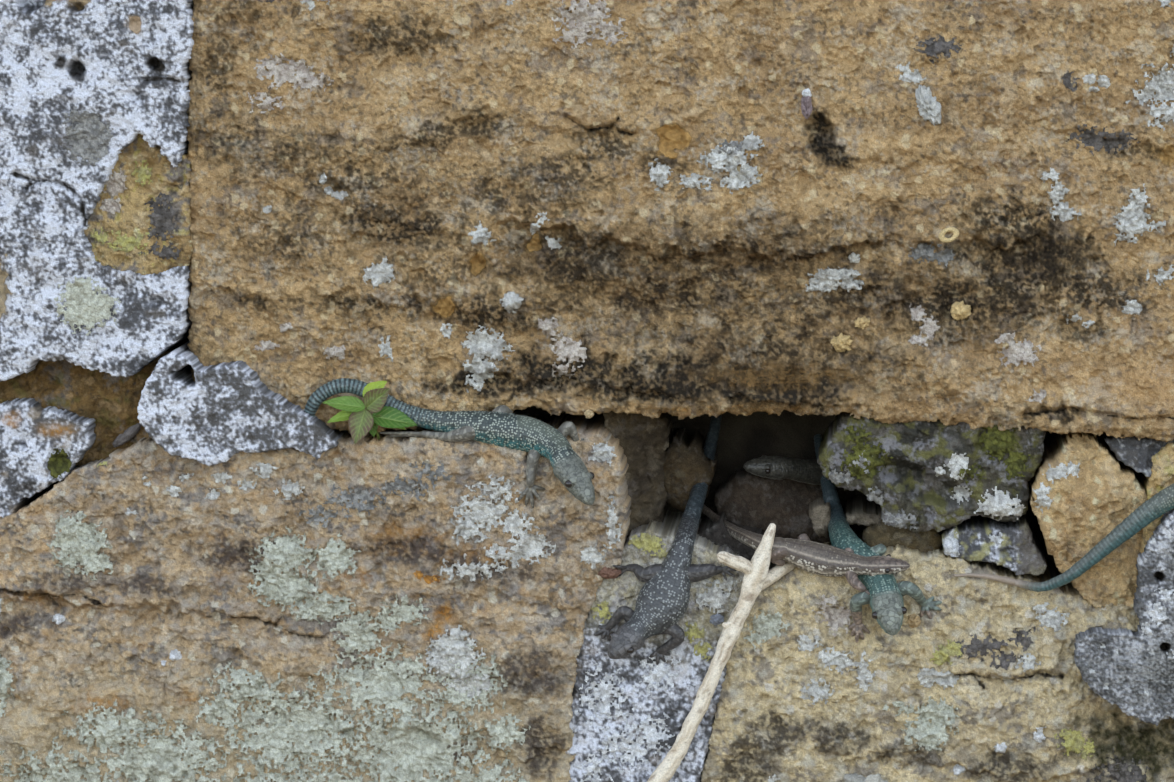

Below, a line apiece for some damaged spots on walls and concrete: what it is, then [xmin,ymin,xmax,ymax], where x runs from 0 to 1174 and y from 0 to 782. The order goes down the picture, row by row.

crack [1,589,106,607]
crack [232,617,312,638]